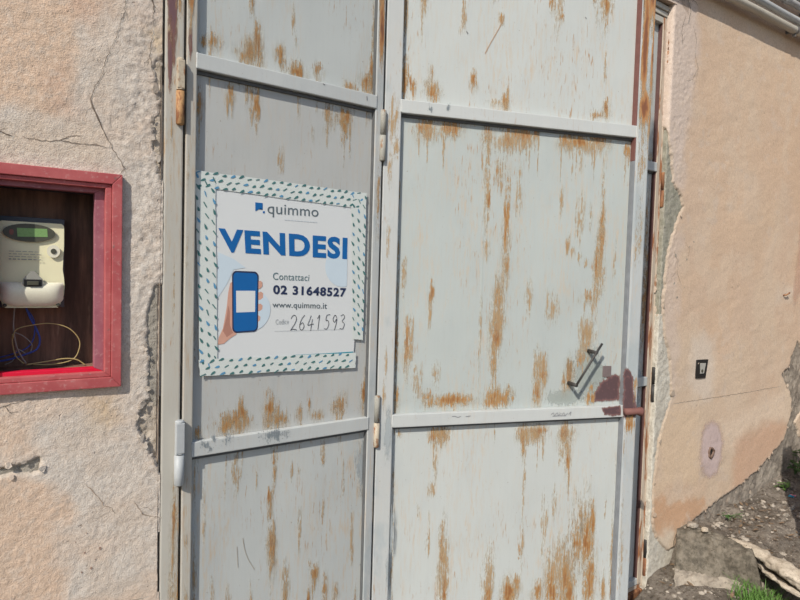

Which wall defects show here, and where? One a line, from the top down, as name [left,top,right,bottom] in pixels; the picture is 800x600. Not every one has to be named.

crack [0,0,128,174]
crack [147,0,156,80]
rust [167,0,221,92]
rust [388,47,439,176]
rust [624,0,656,180]
rust [480,126,539,409]
rust [559,134,616,393]
flaking render [0,457,46,480]
rust [382,316,473,413]
rust [534,421,623,600]
flaking render [640,129,682,590]
flaking render [695,343,800,520]